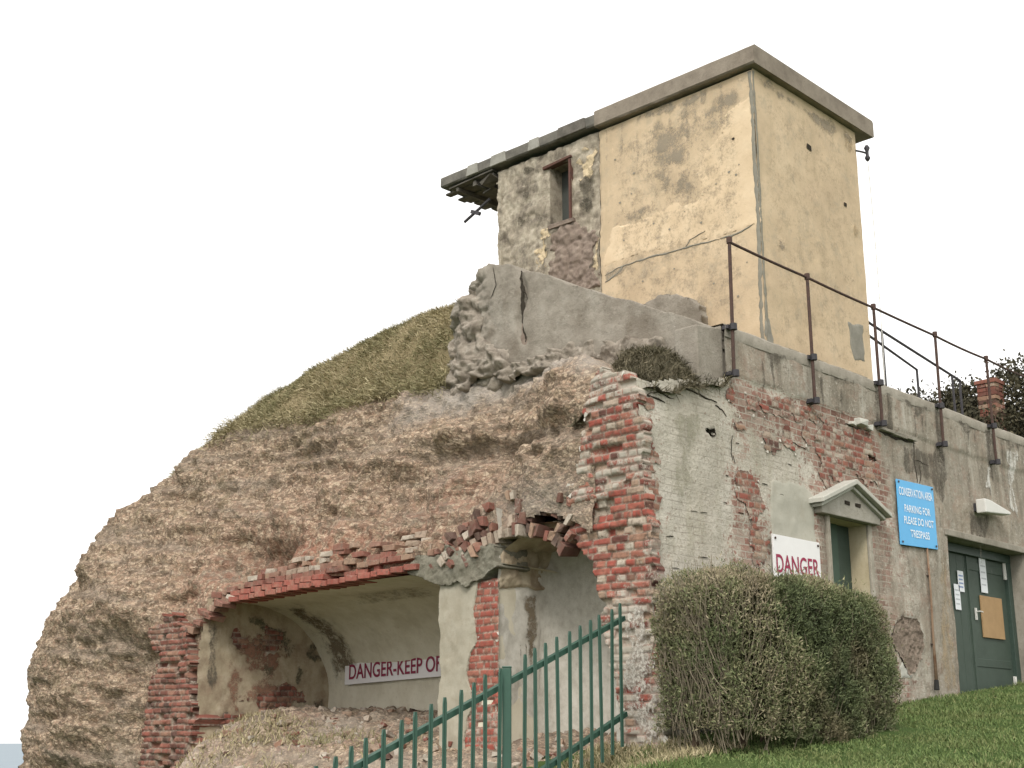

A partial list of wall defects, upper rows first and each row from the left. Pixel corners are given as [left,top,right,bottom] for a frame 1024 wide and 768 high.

damp [646,95,700,182]
flaking render [496,132,602,293]
crack [605,71,768,341]
crack [491,269,528,342]
spalling [446,289,664,396]
spalling [644,397,663,525]
crack [647,382,735,462]
spalling [725,377,882,489]
spalling [489,539,551,591]
spalling [735,470,770,568]
peeling [623,585,669,746]
spalling [891,615,925,675]